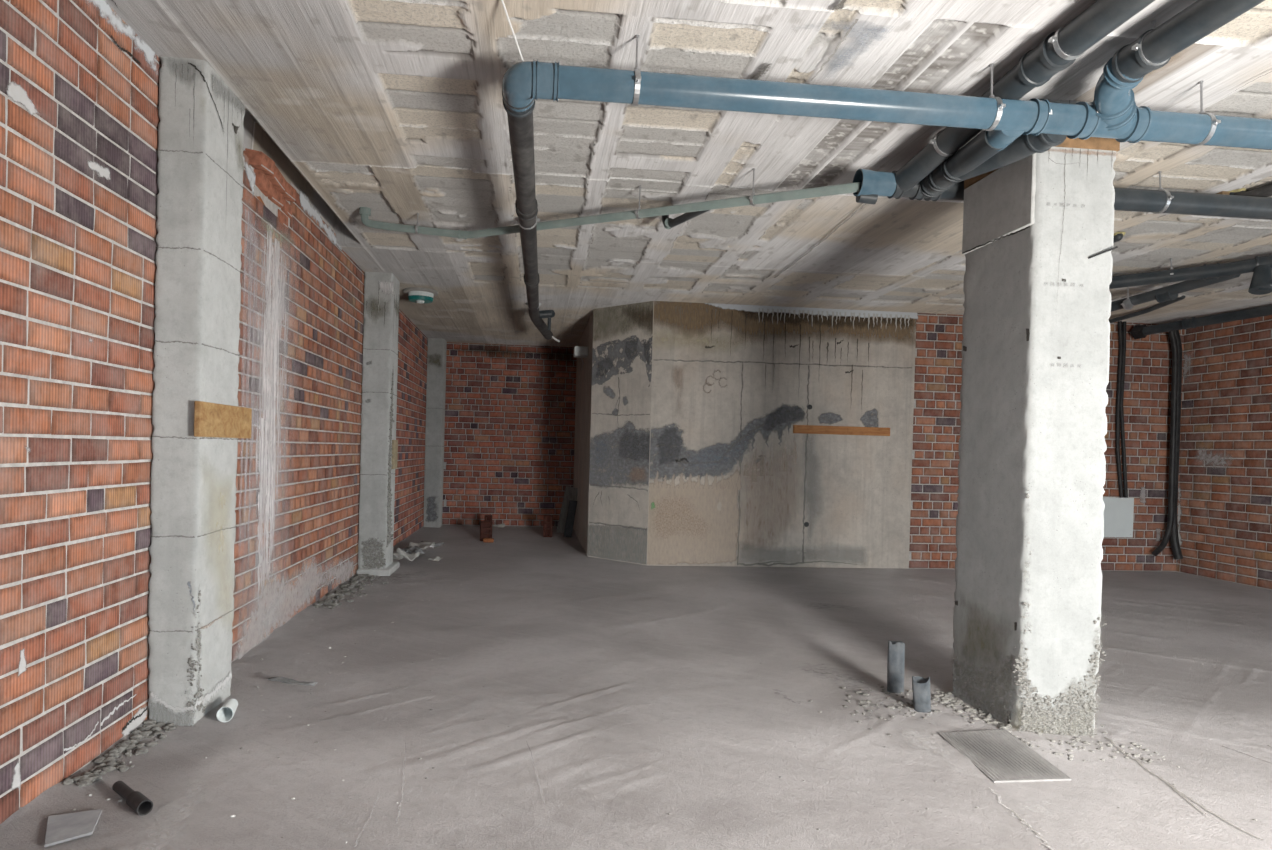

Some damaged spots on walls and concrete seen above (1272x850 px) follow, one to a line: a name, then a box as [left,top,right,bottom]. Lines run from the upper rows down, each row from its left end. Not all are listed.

water stain [593,301,918,427]
water stain [239,226,353,659]
spalling [185,590,206,713]
spalling [1007,602,1106,736]
crack [1104,737,1263,840]